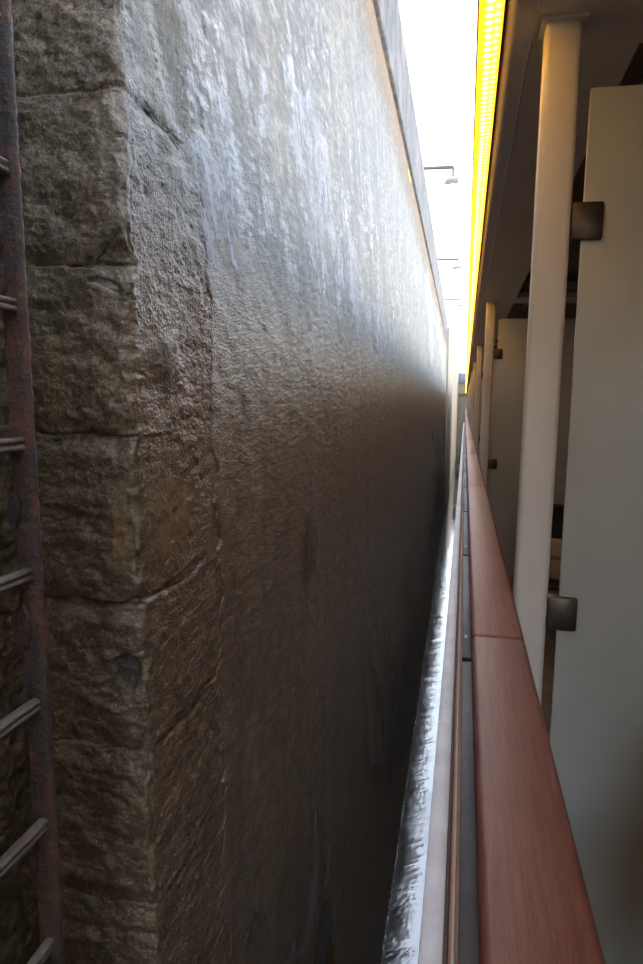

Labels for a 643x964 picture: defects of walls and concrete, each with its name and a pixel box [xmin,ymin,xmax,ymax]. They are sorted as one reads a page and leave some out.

leakage [186,69,239,273]
leakage [254,64,272,138]
leakage [284,60,330,272]
leakage [360,0,446,378]
leakage [336,237,382,351]